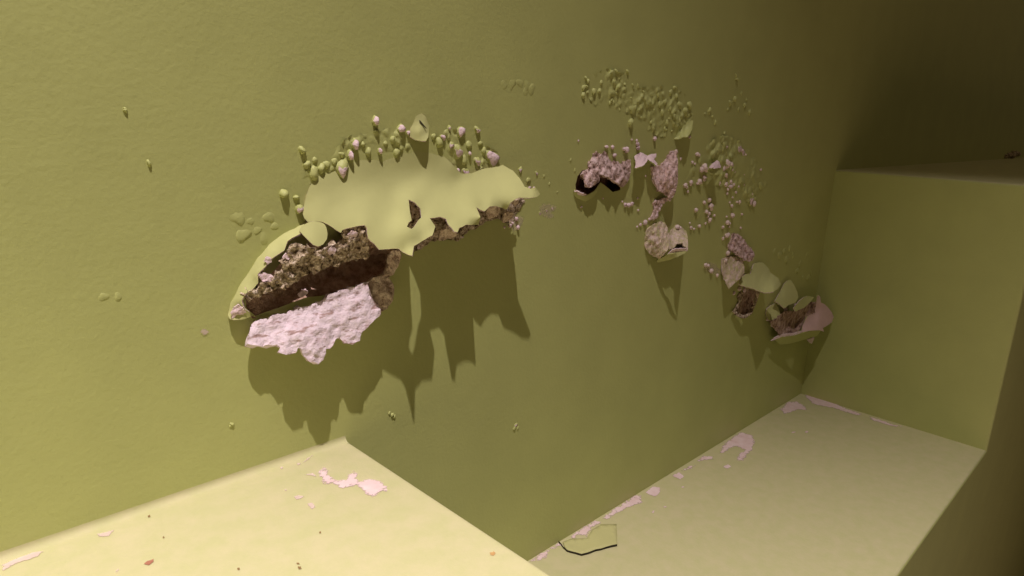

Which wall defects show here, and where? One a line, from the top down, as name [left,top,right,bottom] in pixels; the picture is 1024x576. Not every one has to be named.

spalling [573,119,693,228]
peeling [228,113,540,364]
peeling [721,233,833,344]
peeling [297,455,387,496]
peeling [673,432,755,488]
crack [558,524,617,556]
peeling [571,487,666,538]